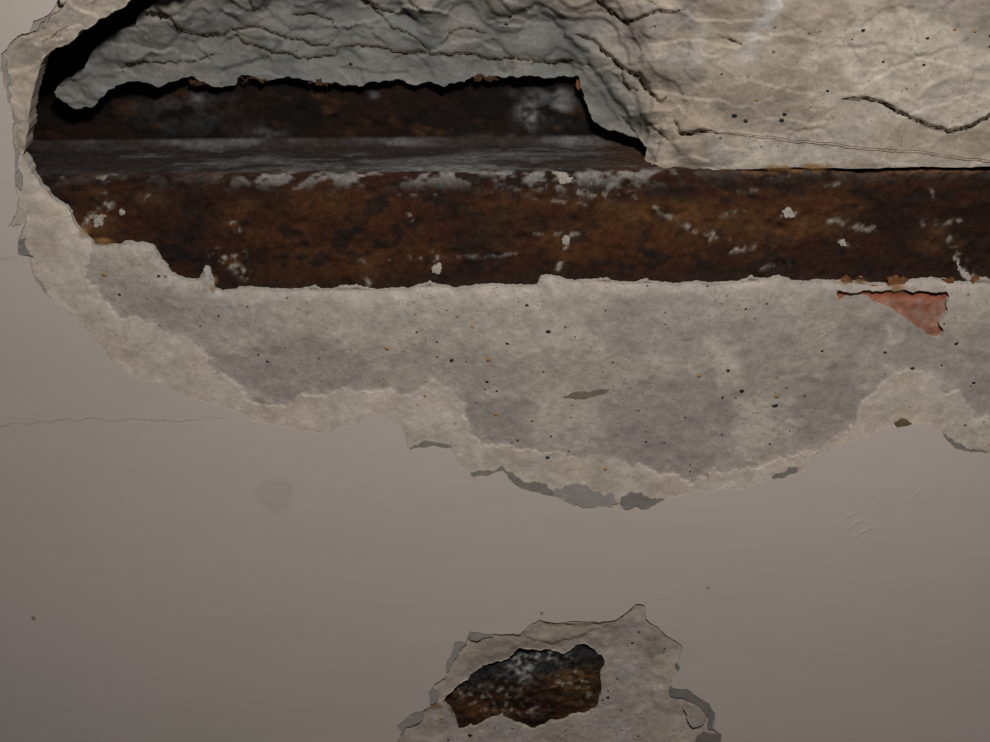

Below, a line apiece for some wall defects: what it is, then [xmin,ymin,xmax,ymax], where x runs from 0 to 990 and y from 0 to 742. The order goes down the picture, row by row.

flaking render [1,0,990,511]
corrosion [429,644,604,728]
flaking render [397,604,722,742]